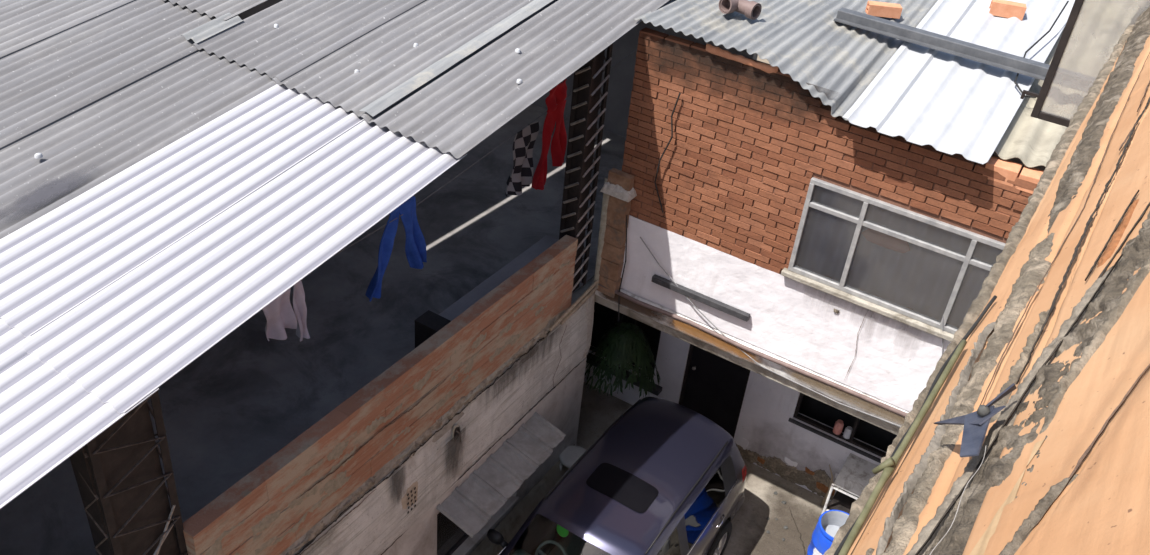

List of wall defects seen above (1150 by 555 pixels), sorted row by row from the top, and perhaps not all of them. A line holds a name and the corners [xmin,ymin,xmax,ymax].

water stain [0,174,85,217]
spalling [823,0,1150,555]
spalling [286,310,565,555]
water stain [392,466,405,500]
peeling [737,438,839,500]